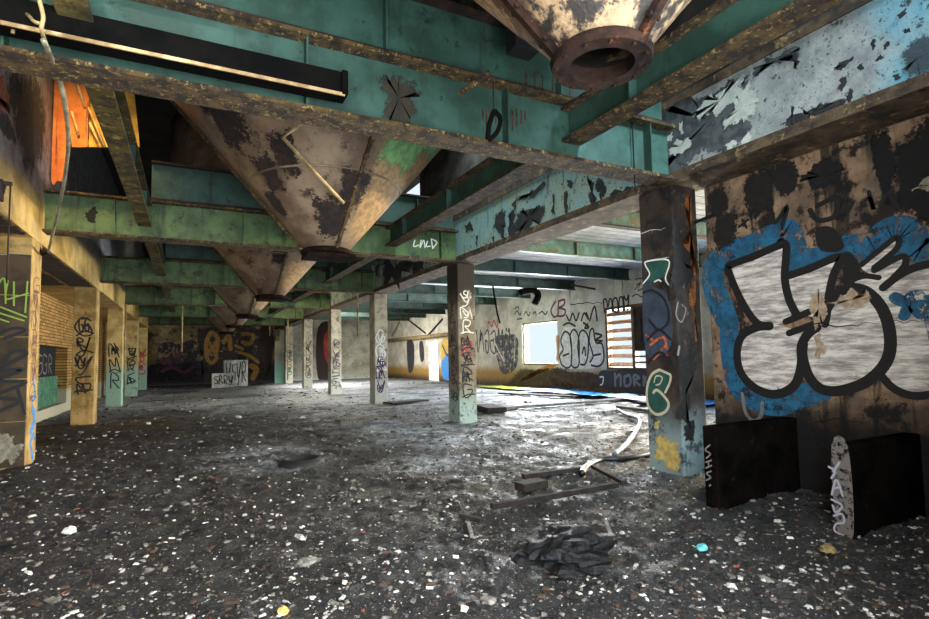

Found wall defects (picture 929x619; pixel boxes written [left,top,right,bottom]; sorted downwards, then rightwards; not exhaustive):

peeling [870,39,890,62]
peeling [834,57,864,103]
peeling [662,46,800,173]
corrosion [200,106,373,240]
peeling [491,180,573,242]
peeling [587,176,633,204]
spalling [799,156,845,190]